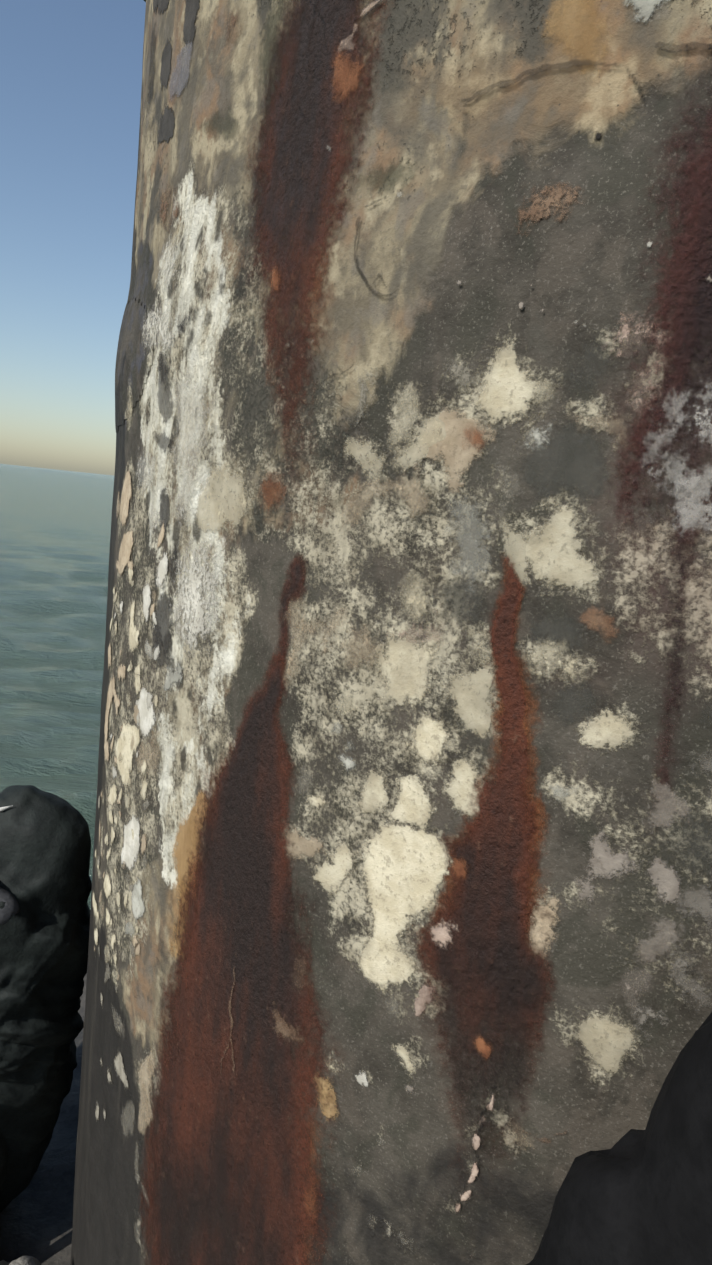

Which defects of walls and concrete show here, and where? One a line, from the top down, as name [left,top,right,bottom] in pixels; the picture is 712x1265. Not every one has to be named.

rust [253,0,386,415]
damp [142,308,174,352]
damp [523,425,607,497]
damp [173,541,226,650]
rust [418,557,554,1126]